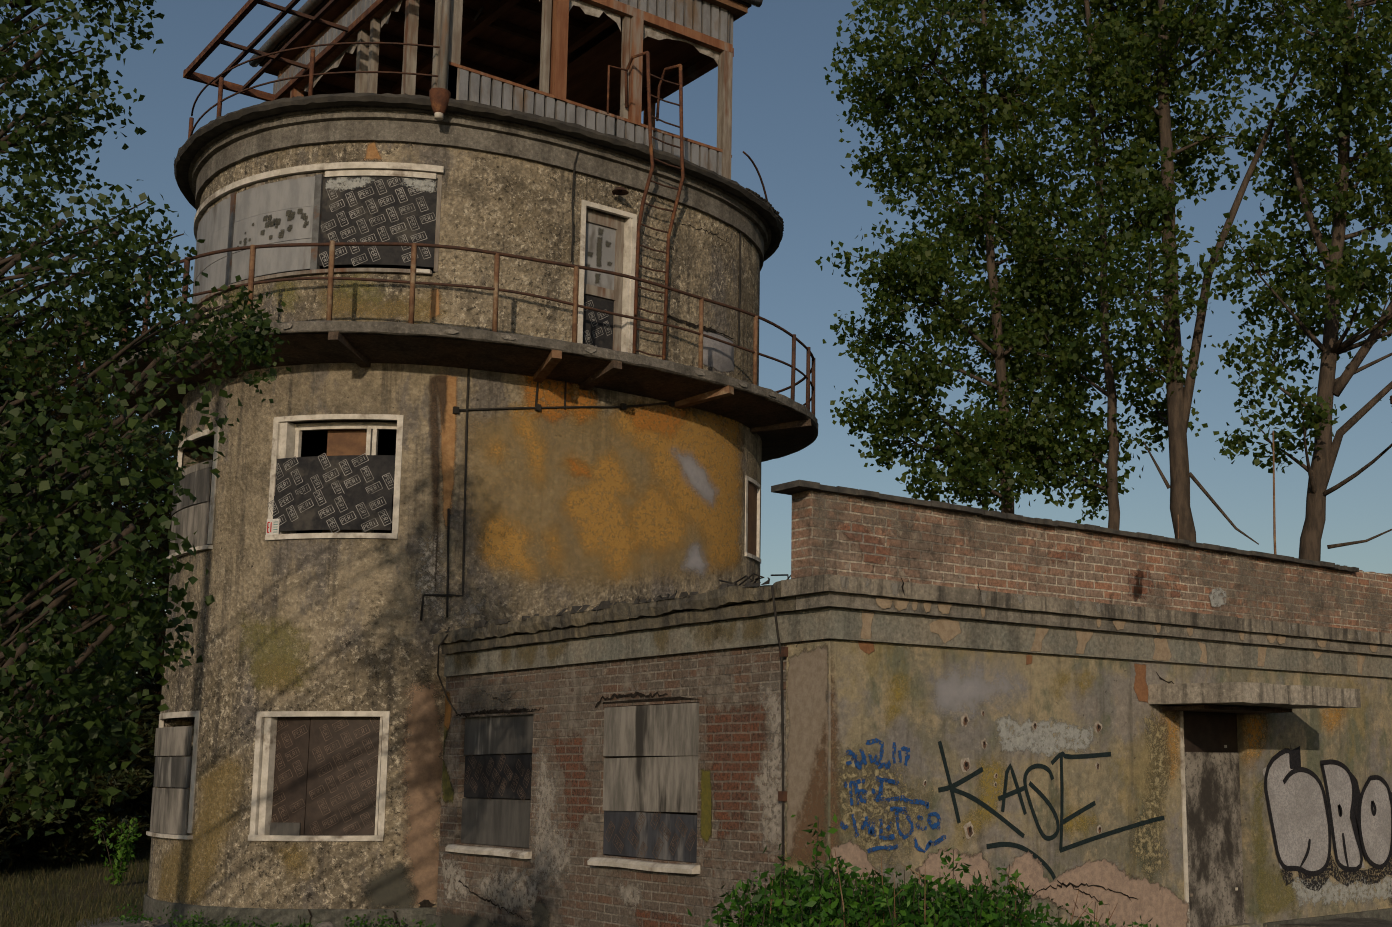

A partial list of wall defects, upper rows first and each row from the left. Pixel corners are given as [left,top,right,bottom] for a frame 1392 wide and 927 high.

leakage [514,376,595,477]
leakage [565,406,741,578]
peeling [858,598,961,655]
peeling [1075,618,1126,654]
peeling [1239,632,1286,667]
peeling [831,624,1190,927]
crack [1033,880,1138,905]